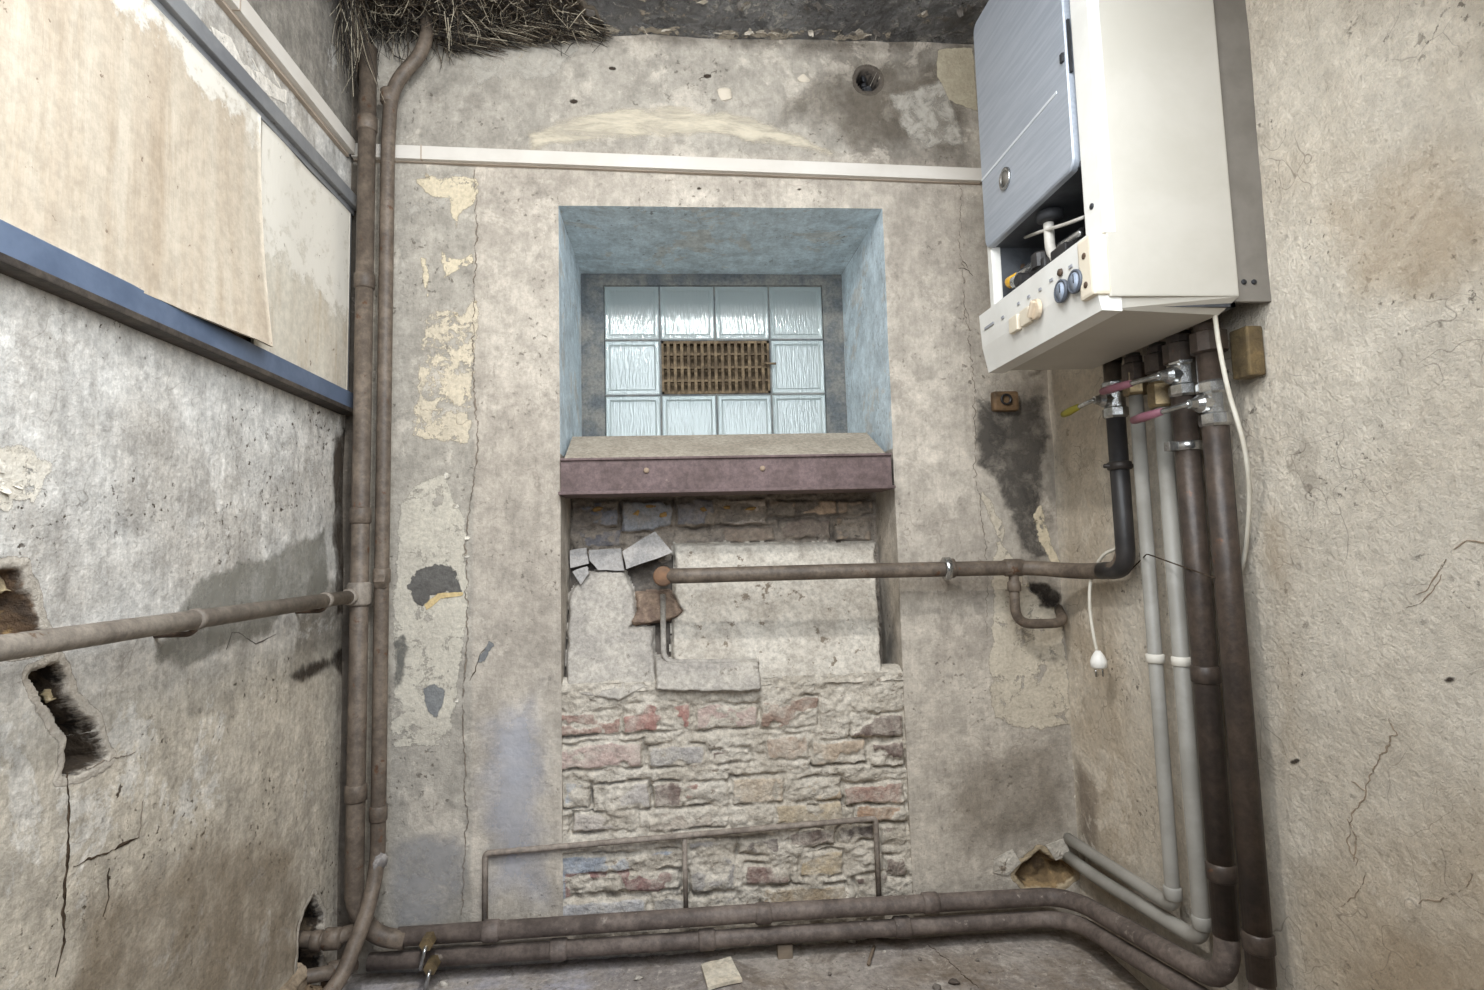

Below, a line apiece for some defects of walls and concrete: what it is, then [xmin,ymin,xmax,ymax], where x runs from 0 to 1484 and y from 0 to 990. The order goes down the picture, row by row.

spalling [325,0,899,102]
peeling [408,173,479,225]
peeling [413,252,479,444]
damp [976,397,1049,557]
spalling [0,556,52,635]
peeling [390,472,470,747]
spalling [570,548,625,585]
spalling [9,652,116,787]
crack [55,752,143,977]
flaking render [993,838,1080,890]